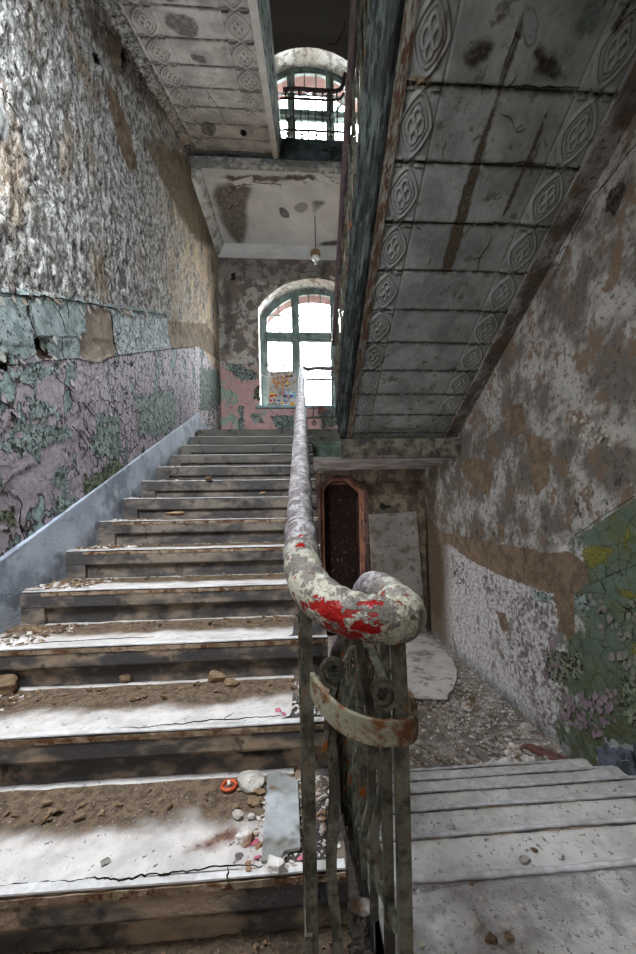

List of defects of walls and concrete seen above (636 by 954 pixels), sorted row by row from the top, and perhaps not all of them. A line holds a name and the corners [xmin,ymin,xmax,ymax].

leakage [165,0,198,37]
peeling [232,176,254,188]
leakage [442,17,523,275]
leakage [503,113,547,216]
leakage [214,175,315,243]
flaking render [503,403,549,496]
peeling [573,416,619,446]
flaking render [460,456,493,498]
peeling [0,506,17,534]
flaking render [425,516,636,762]
crack [0,864,264,888]